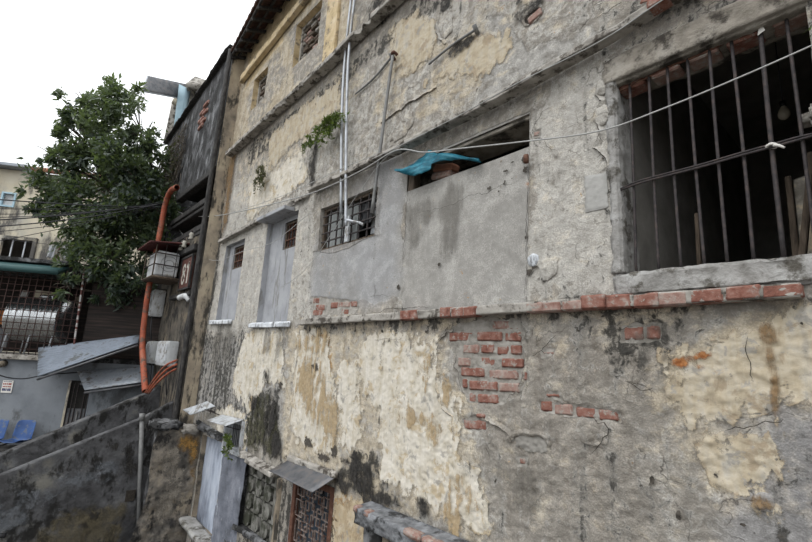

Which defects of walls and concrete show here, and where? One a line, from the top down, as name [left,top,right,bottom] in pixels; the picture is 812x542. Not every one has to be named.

peeling [388,8,438,78]
peeling [423,27,513,89]
crack [570,78,609,173]
crack [401,102,566,294]
rust [672,351,711,369]
leakage [759,324,779,413]
leakage [263,396,281,458]
peeling [216,317,529,542]
peeling [619,299,812,524]
crack [725,419,783,431]
leakage [333,451,400,508]
leakage [415,497,429,519]